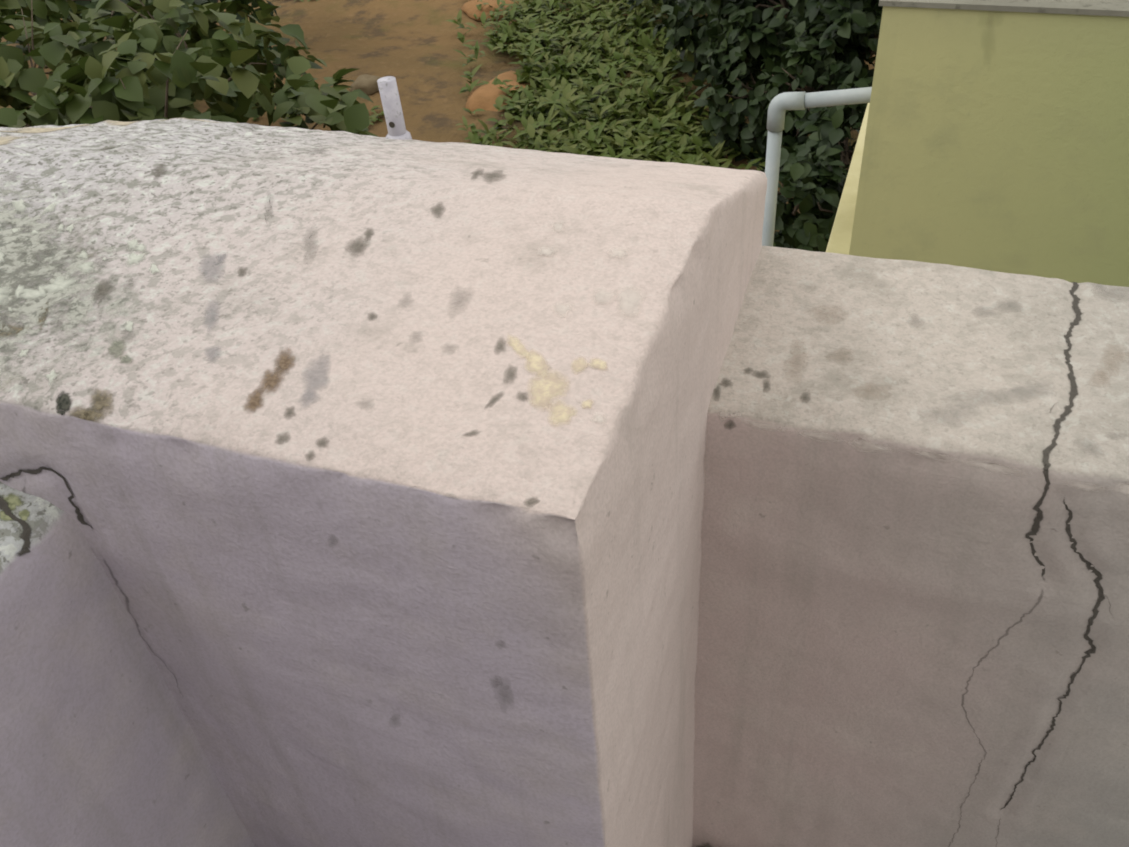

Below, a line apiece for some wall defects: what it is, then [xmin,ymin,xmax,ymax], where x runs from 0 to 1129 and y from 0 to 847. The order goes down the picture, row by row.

water stain [351,231,372,252]
water stain [56,392,71,415]
crack [0,467,92,556]
crack [1001,282,1105,809]